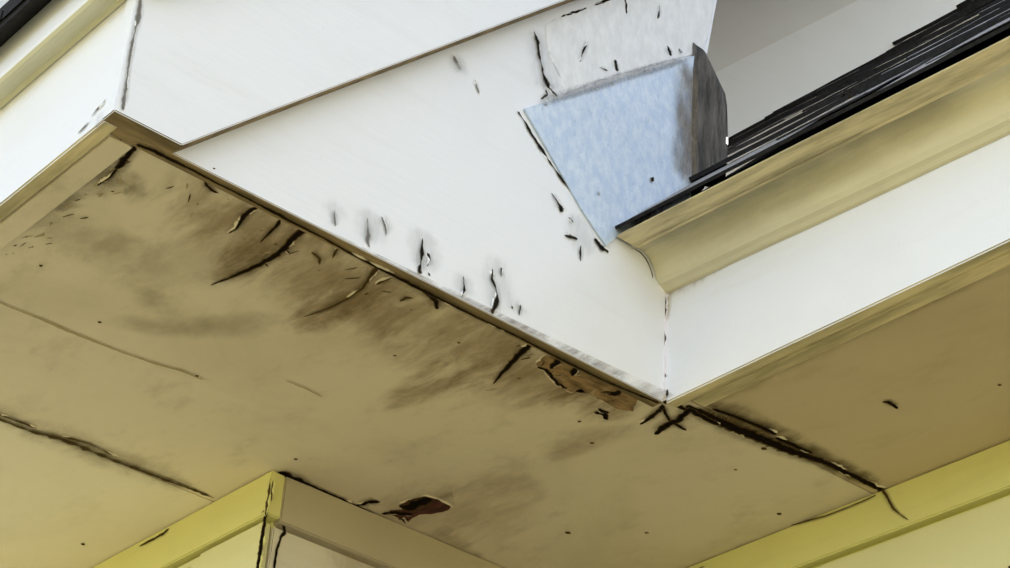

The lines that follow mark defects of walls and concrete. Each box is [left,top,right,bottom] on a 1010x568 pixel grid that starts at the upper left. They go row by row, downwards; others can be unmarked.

crack [0,302,202,380]
peeling [536,355,638,420]
crack [639,400,720,435]
crack [0,413,213,498]
crack [140,529,168,546]
crack [262,478,286,568]
peeling [381,494,453,522]
crack [791,489,908,526]